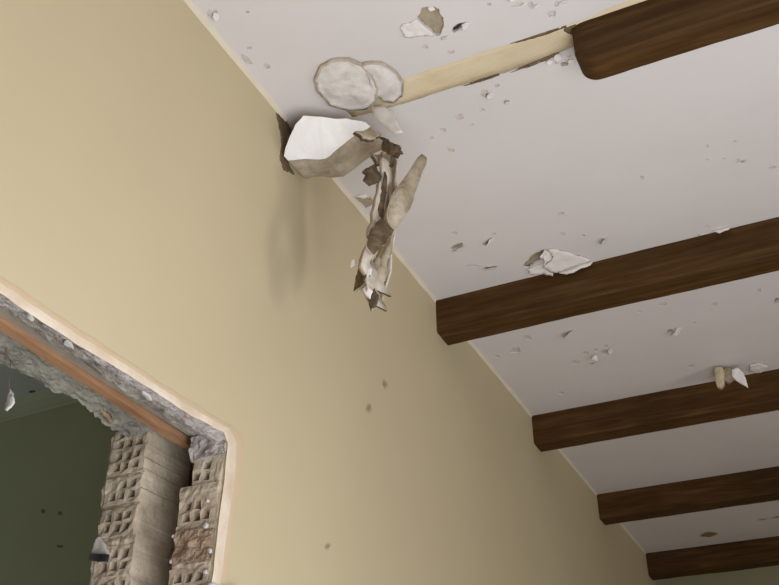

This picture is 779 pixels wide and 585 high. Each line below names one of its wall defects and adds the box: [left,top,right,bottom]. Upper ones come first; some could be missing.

flaking render [347,0,646,117]
spalling [276,113,294,175]
spalling [355,193,373,207]
peeling [523,249,593,276]
flaking render [0,276,243,585]